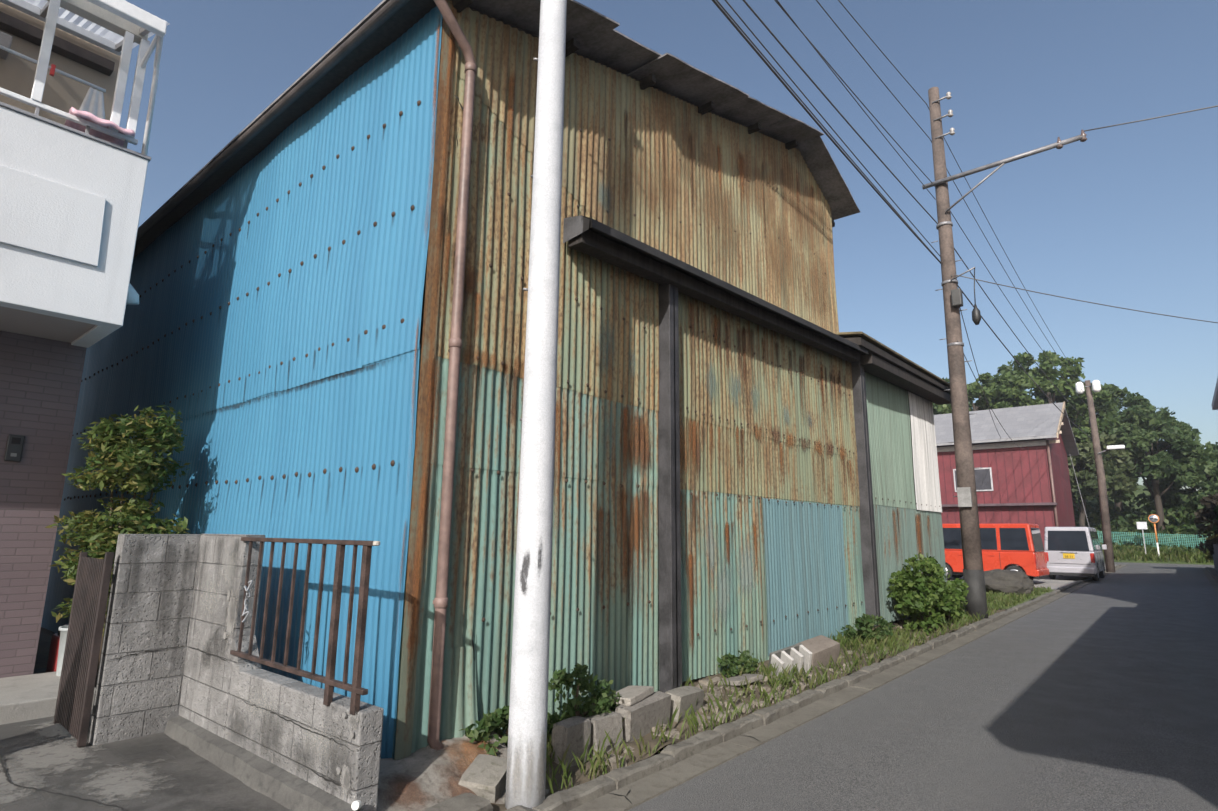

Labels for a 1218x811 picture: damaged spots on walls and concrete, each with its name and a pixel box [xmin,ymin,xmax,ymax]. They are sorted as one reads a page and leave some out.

corrosion [433,20,453,156]
corrosion [463,263,480,334]
corrosion [465,349,524,417]
corrosion [714,315,805,395]
corrosion [820,364,847,411]
corrosion [680,421,720,470]
corrosion [735,425,852,479]
corrosion [400,324,435,675]
corrosion [598,408,650,590]
corrosion [680,492,698,523]
corrosion [717,523,733,560]
corrosion [688,554,696,636]